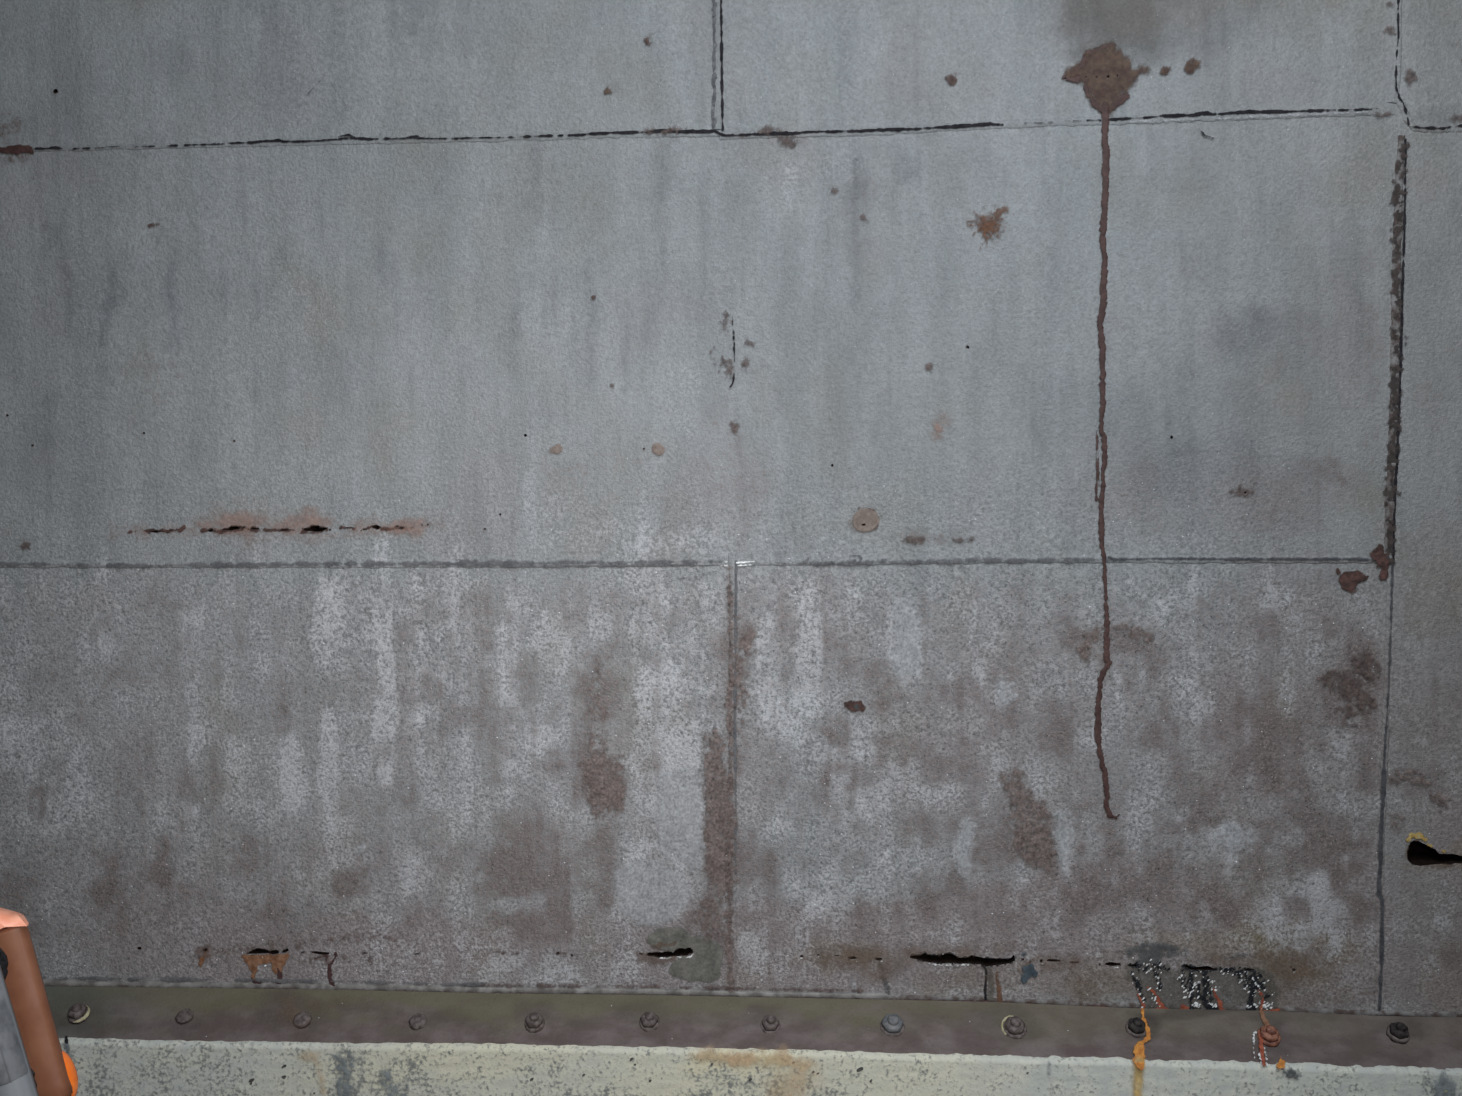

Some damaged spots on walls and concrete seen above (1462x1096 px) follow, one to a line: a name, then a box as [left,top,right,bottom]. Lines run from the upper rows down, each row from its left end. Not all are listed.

rust [968,207,1008,248]
rust [1383,142,1410,568]
rust [1062,42,1201,819]
rust [127,525,413,534]
rust [1336,568,1369,593]
spalling [1407,840,1462,866]
water stain [647,927,723,983]
water stain [1021,953,1038,984]
water stain [1127,943,1280,1011]
rust [1132,1008,1151,1096]
rust [1253,1009,1286,1068]